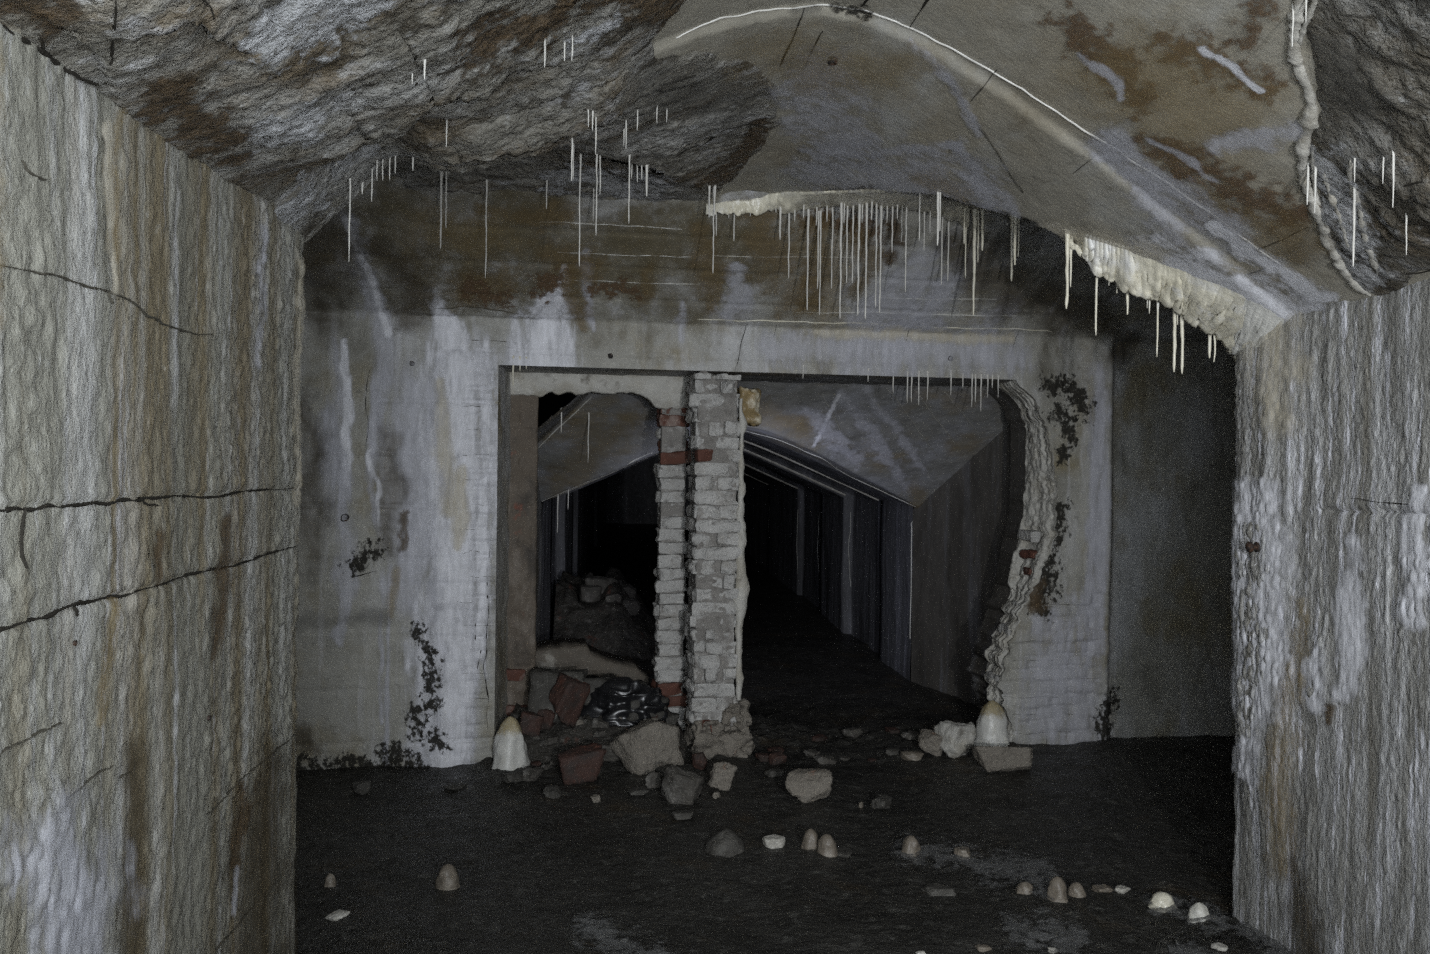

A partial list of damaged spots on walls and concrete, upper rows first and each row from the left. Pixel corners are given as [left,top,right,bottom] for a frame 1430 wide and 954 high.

crack [21,160,49,181]
water stain [102,121,117,293]
crack [0,265,214,335]
crack [0,487,294,569]
water stain [230,54,1339,954]
crack [0,546,296,633]